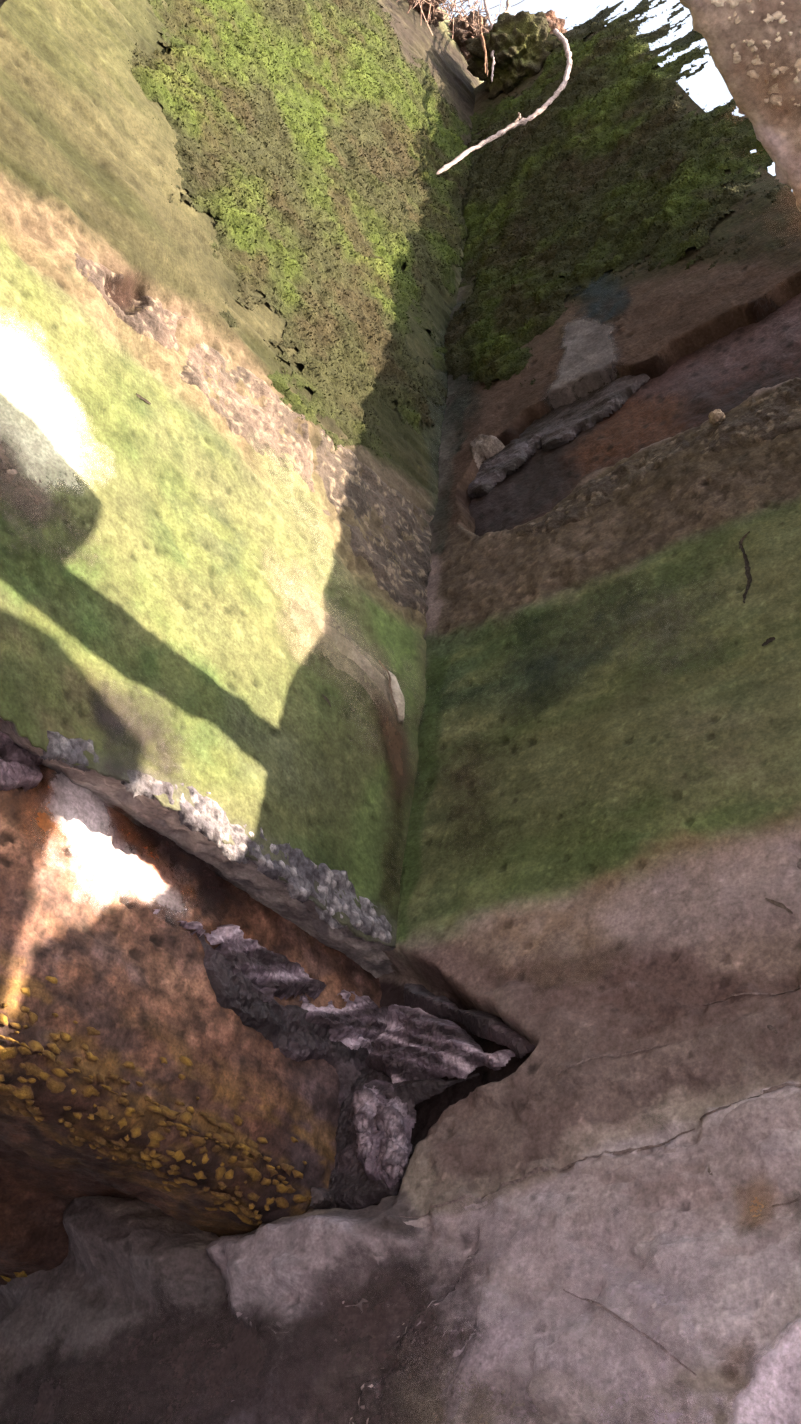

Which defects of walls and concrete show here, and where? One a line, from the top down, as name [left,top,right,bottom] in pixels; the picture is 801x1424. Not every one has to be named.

crack [398,1083,801,1218]